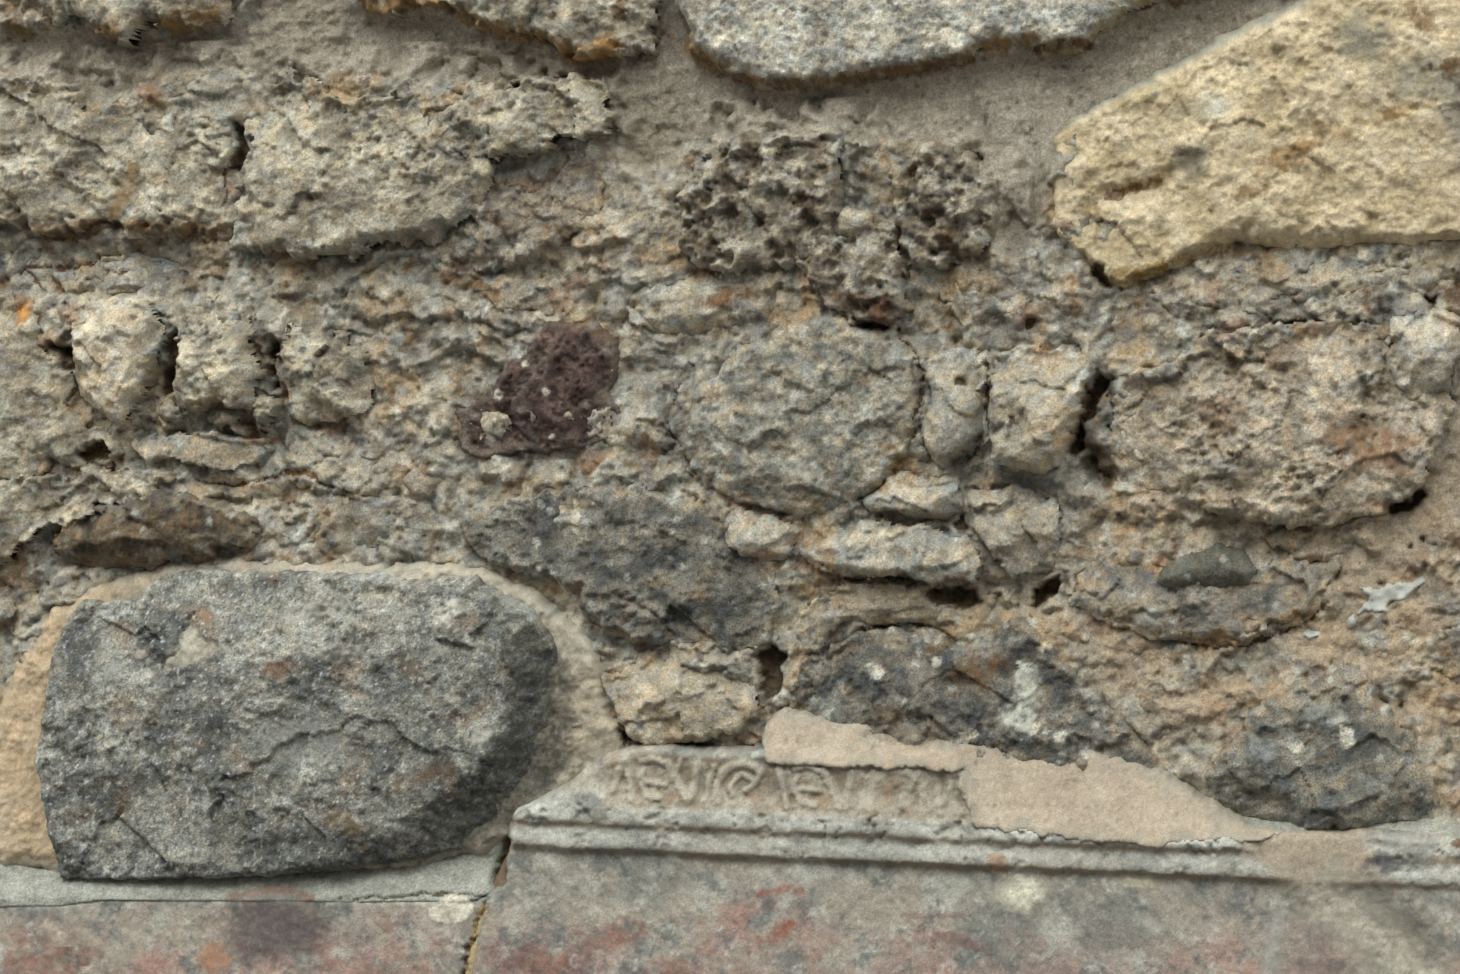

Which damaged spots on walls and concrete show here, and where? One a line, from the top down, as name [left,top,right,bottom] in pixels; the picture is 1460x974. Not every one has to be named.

crack [356,890,454,900]